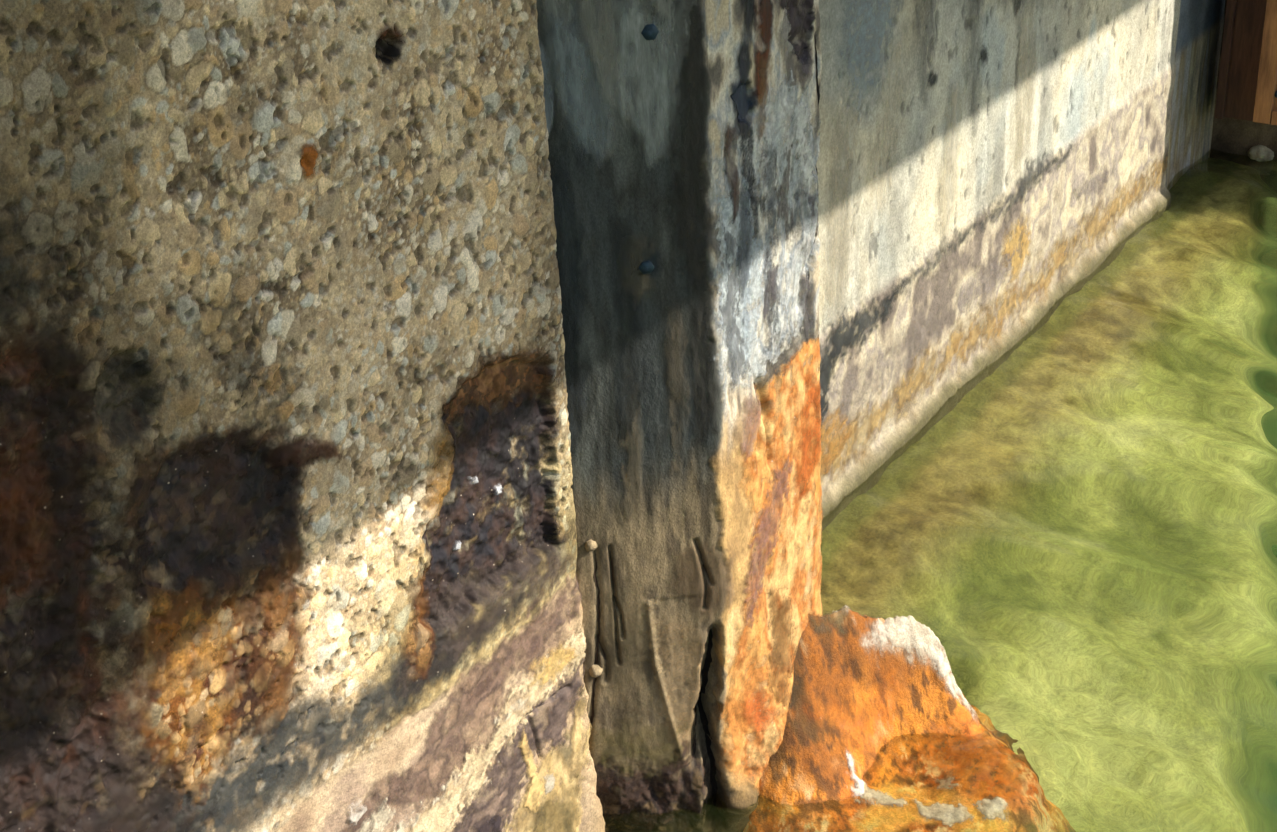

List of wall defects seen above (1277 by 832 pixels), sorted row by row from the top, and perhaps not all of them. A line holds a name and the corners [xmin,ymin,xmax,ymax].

rust [753,0,774,107]
water stain [539,0,1072,473]
rust [0,340,341,832]
crack [590,548,620,730]
crack [693,541,718,795]
rust [721,338,822,788]